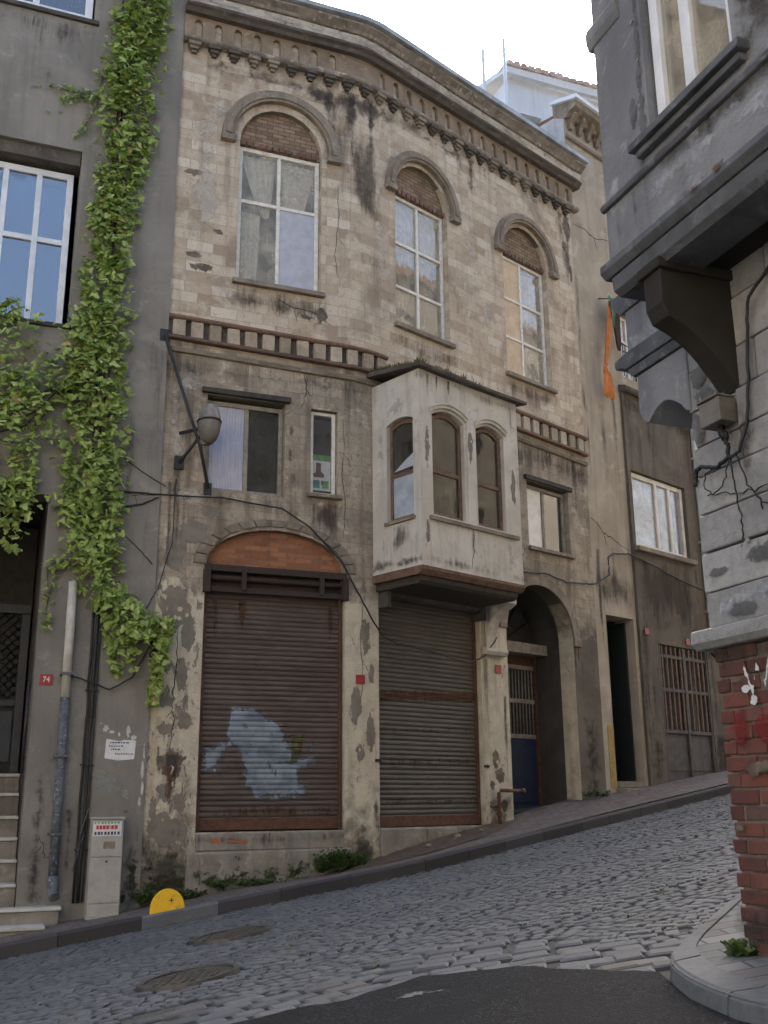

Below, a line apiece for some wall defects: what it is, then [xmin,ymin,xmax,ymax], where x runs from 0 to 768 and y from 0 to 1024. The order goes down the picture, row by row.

water stain [193,90,469,230]
spalling [186,251,212,273]
peeling [101,505,220,848]
peeling [350,619,376,763]
spalling [490,750,506,789]